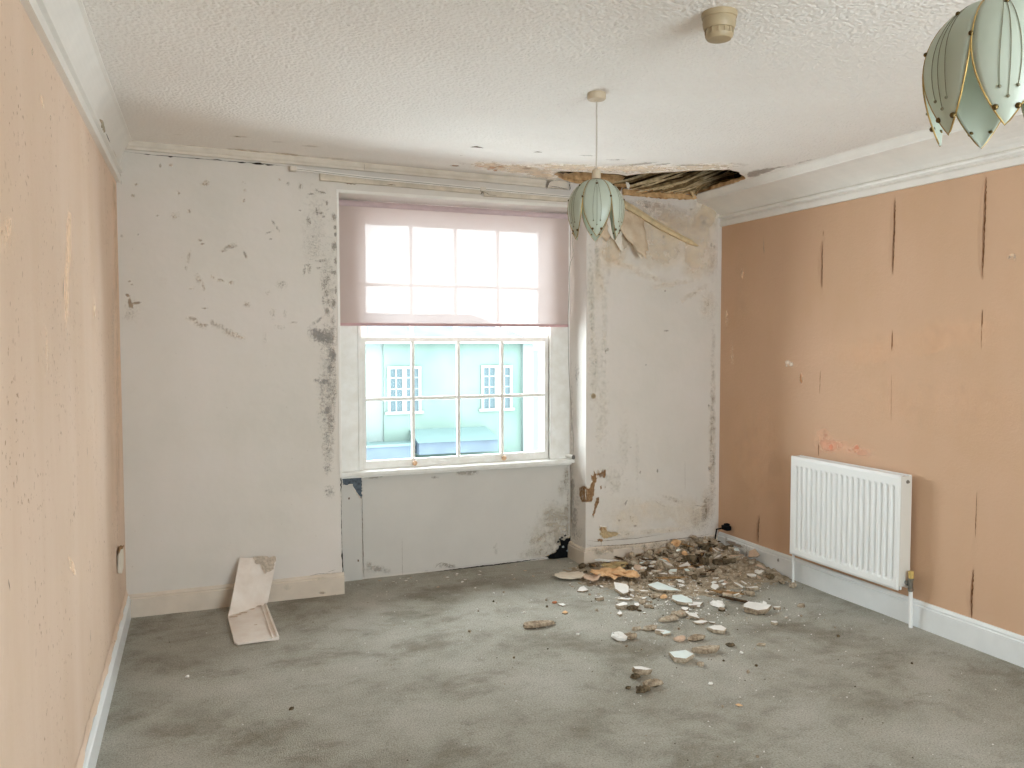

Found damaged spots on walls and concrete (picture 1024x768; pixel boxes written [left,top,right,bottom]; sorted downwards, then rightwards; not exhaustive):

spalling [554,171,590,184]
spalling [603,170,746,195]
water stain [299,185,337,384]
peeling [342,478,363,499]
flaking render [579,468,620,542]